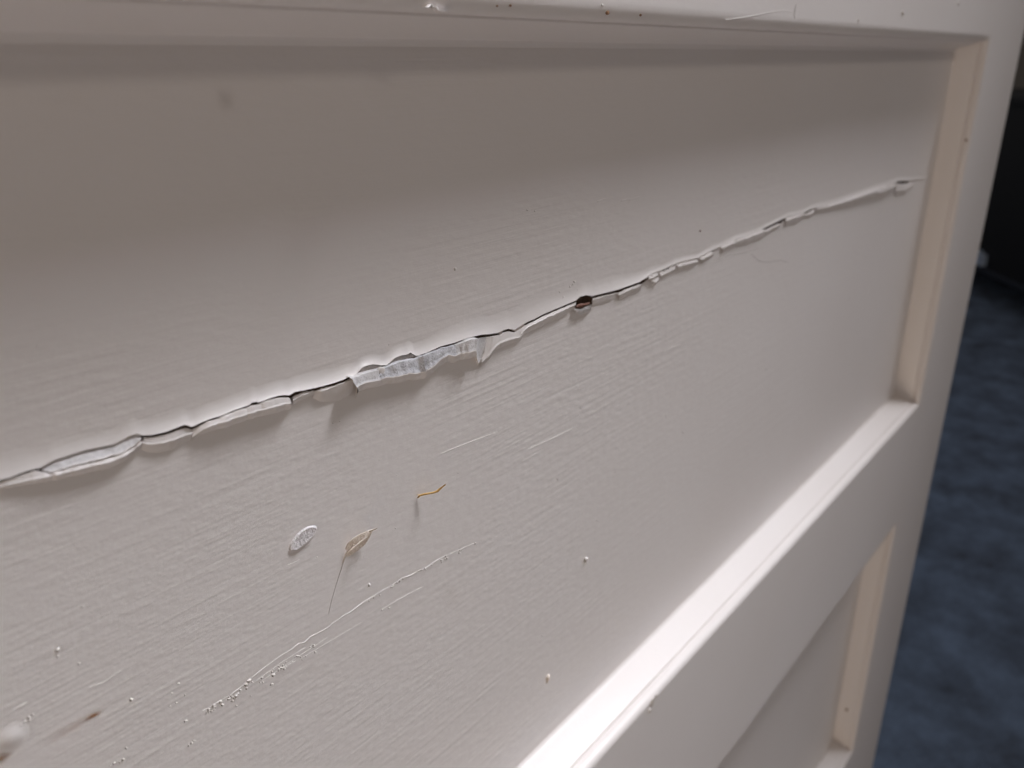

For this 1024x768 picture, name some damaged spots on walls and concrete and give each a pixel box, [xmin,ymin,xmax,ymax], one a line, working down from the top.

crack [0,174,933,489]